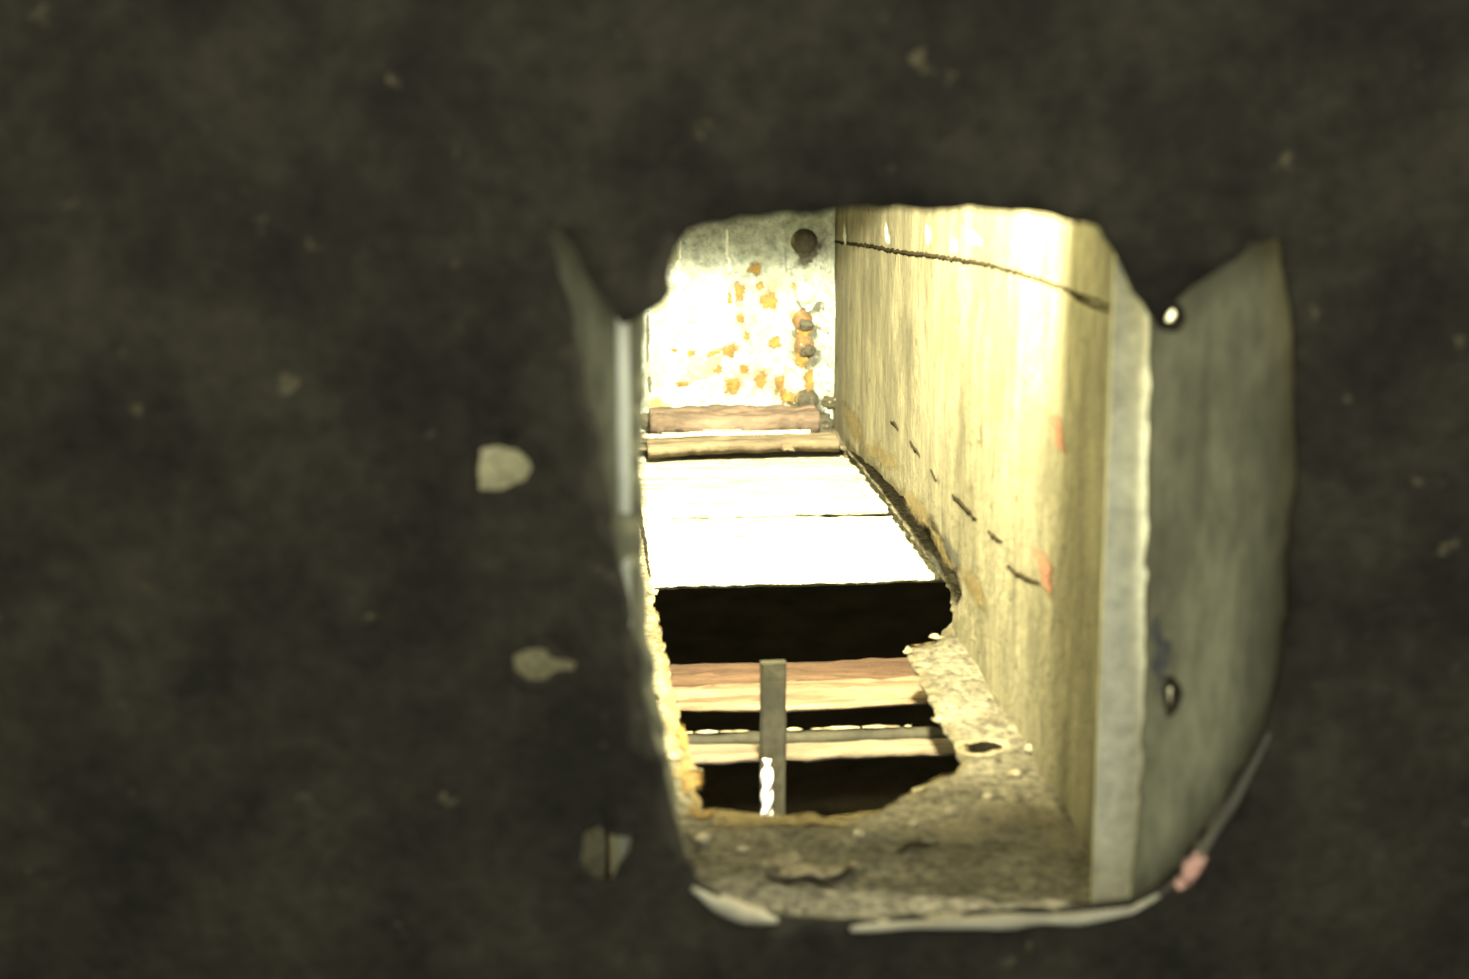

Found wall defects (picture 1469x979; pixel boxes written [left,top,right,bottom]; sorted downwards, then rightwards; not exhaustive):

rust [644,398,671,428]
rust [671,263,897,471]
rust [904,491,985,608]